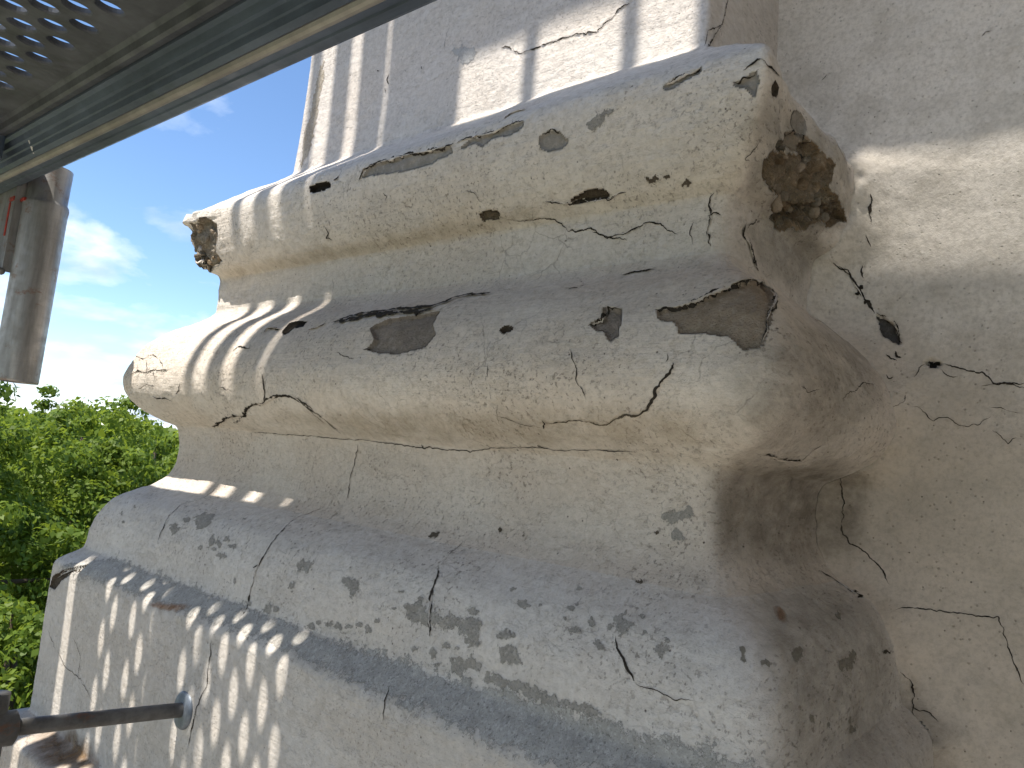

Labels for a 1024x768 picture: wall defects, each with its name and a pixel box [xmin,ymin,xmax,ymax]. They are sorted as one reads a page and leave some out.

crack [501,3,629,54]
flaking render [359,109,526,180]
spalling [762,109,847,232]
spalling [189,217,222,273]
crack [508,193,720,246]
flaking render [264,292,490,354]
flaking render [588,304,622,341]
flaking render [654,278,779,350]
crack [213,352,674,498]
crack [845,351,1024,444]
crack [840,478,888,582]
crack [898,607,1022,682]